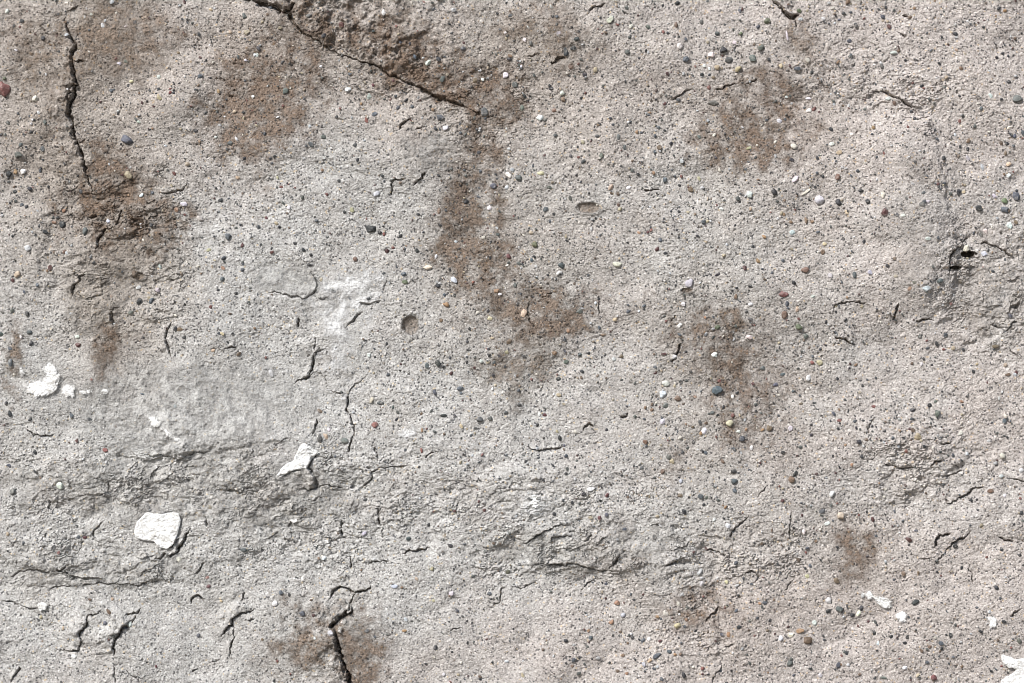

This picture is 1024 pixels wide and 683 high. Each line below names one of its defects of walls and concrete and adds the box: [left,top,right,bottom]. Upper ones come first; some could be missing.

crack [64,5,122,292]
damp [76,137,197,259]
damp [190,0,594,344]
damp [685,65,802,171]
crack [155,519,208,559]
crack [251,269,430,683]